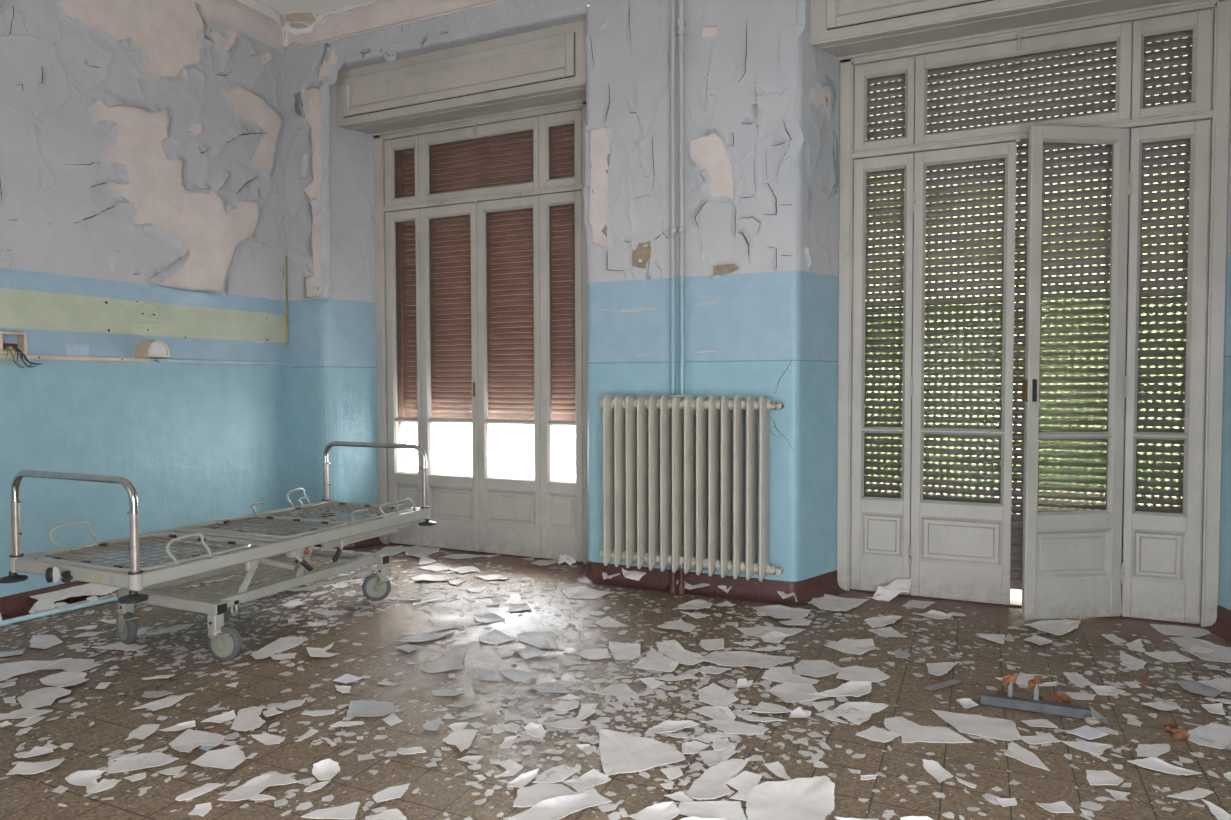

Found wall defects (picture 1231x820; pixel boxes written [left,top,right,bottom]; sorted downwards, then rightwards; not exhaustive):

peeling [50,0,271,301]
peeling [219,0,491,306]
peeling [583,120,658,277]
peeling [684,125,743,208]
flaking render [708,257,745,283]